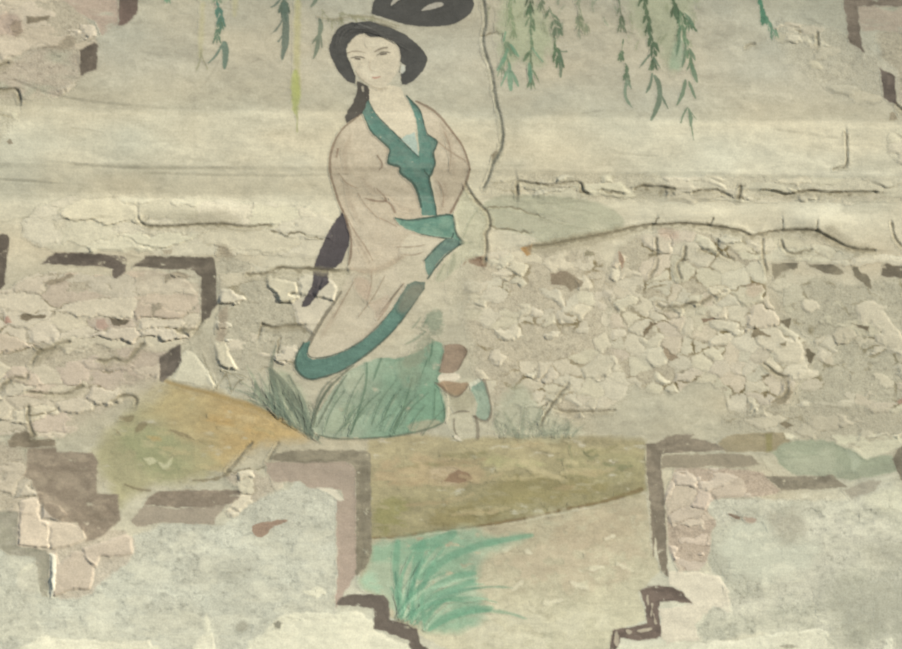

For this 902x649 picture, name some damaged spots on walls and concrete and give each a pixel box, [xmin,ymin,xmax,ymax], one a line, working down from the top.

peeling [0,0,100,145]
peeling [773,19,902,165]
crack [462,0,902,315]
peeling [490,173,902,206]
peeling [0,194,408,649]
crack [538,380,618,429]
crack [758,360,795,409]
damp [762,504,811,549]
damp [811,532,902,649]